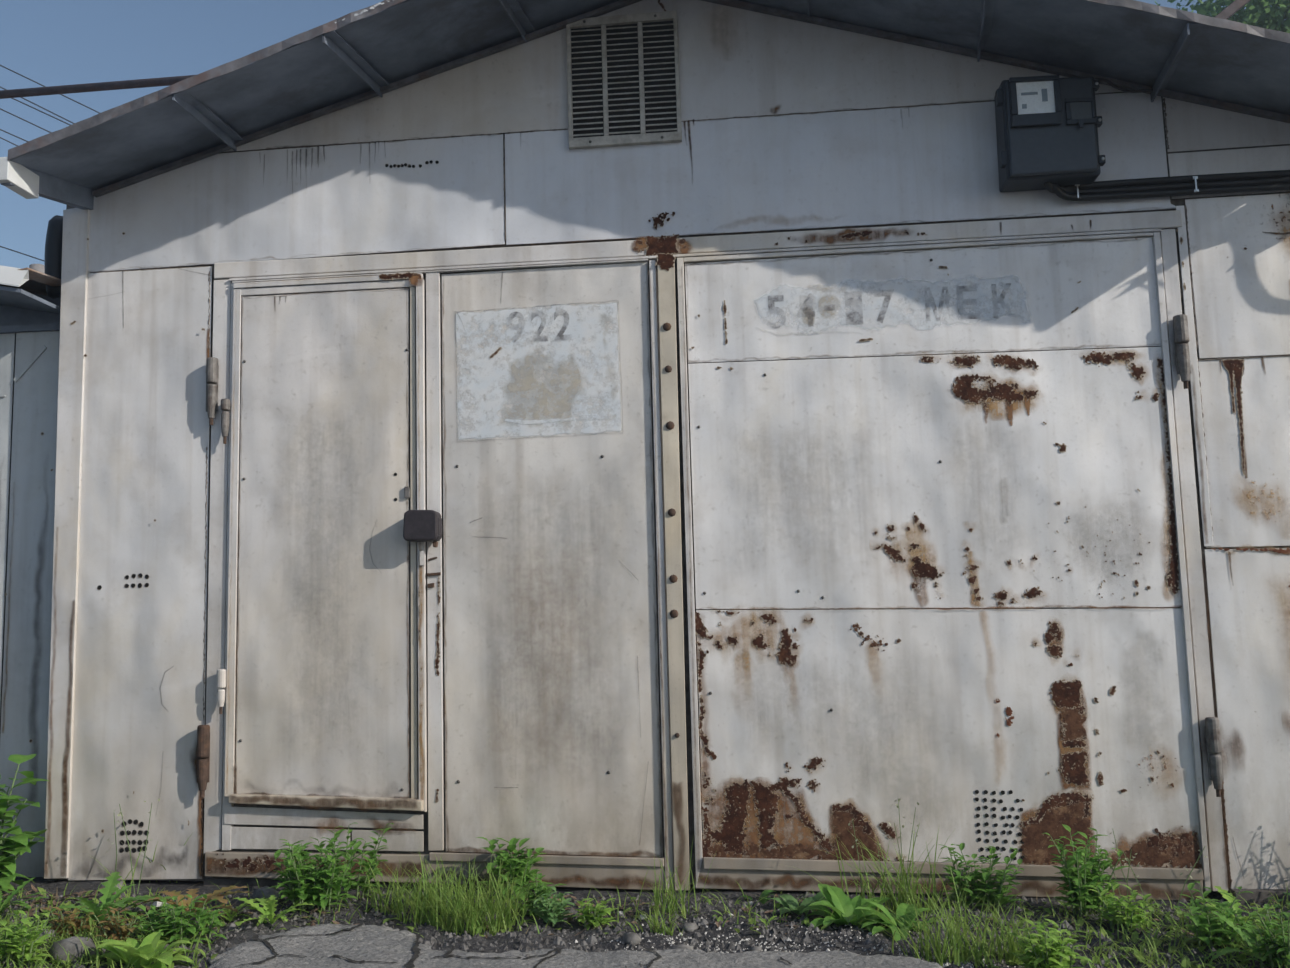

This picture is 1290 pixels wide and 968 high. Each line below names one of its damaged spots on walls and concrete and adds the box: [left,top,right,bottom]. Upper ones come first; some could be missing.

corrosion [633,211,691,271]
peeling [455,303,621,439]
corrosion [874,351,1202,869]
corrosion [1211,546,1290,578]
corrosion [695,608,959,892]
corrosion [529,876,659,888]
corrosion [673,785,684,884]
corrosion [1096,884,1199,900]